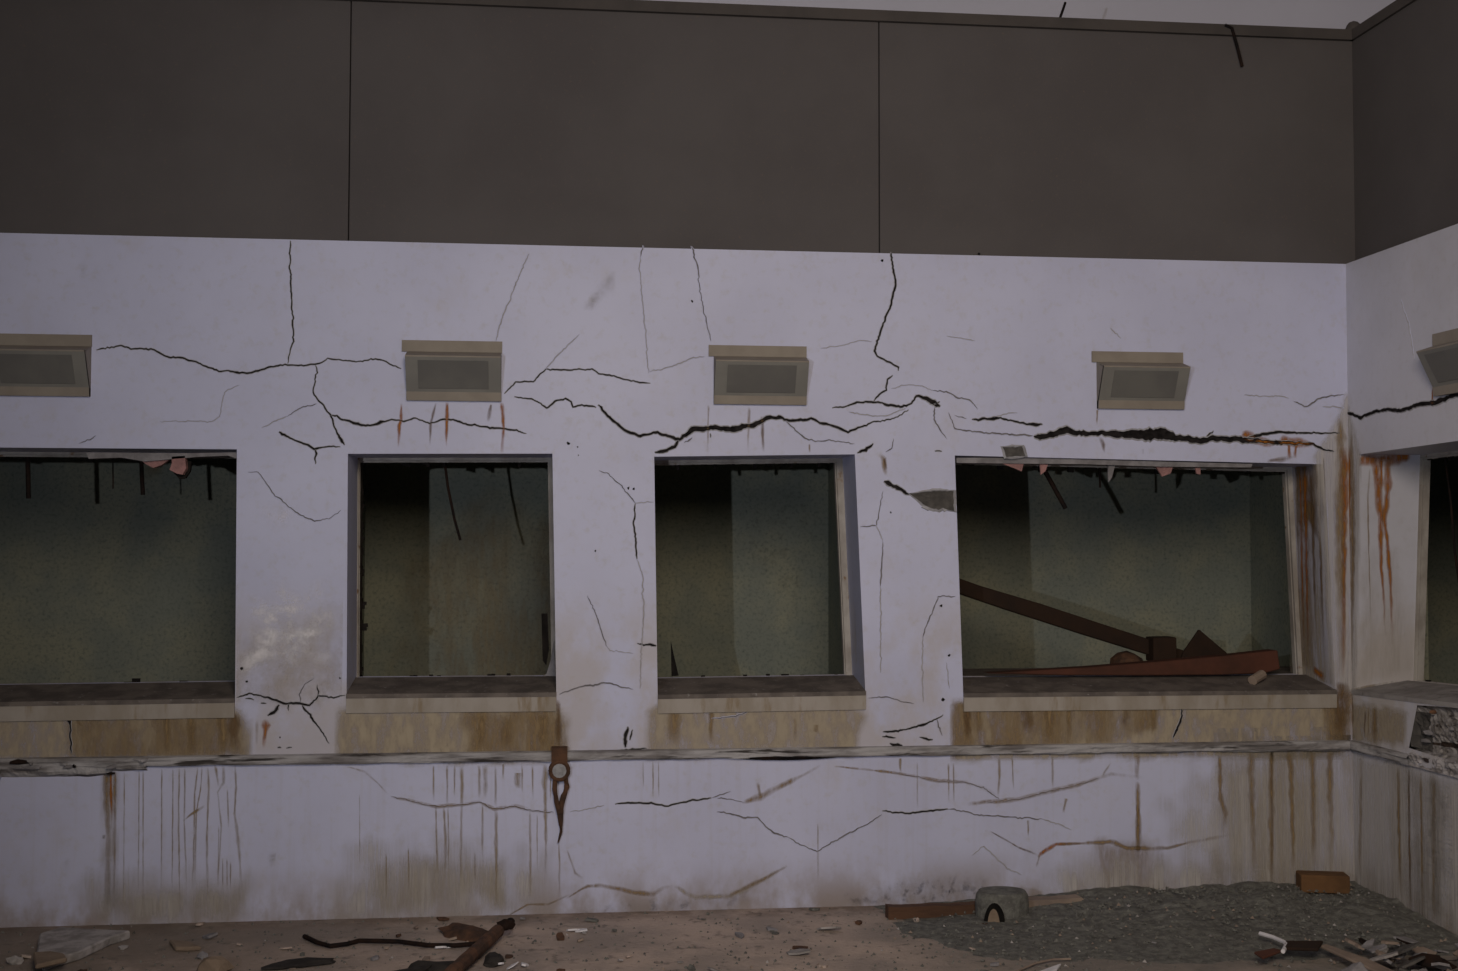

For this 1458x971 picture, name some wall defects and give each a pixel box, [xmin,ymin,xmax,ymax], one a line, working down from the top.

crack [96,241,1458,875]
corrosion [1243,397,1409,743]
leakage [0,711,249,859]
leakage [338,707,565,833]
leakage [650,708,863,749]
leakage [948,704,1347,788]
leakage [1354,763,1458,934]
spalling [1408,705,1458,778]